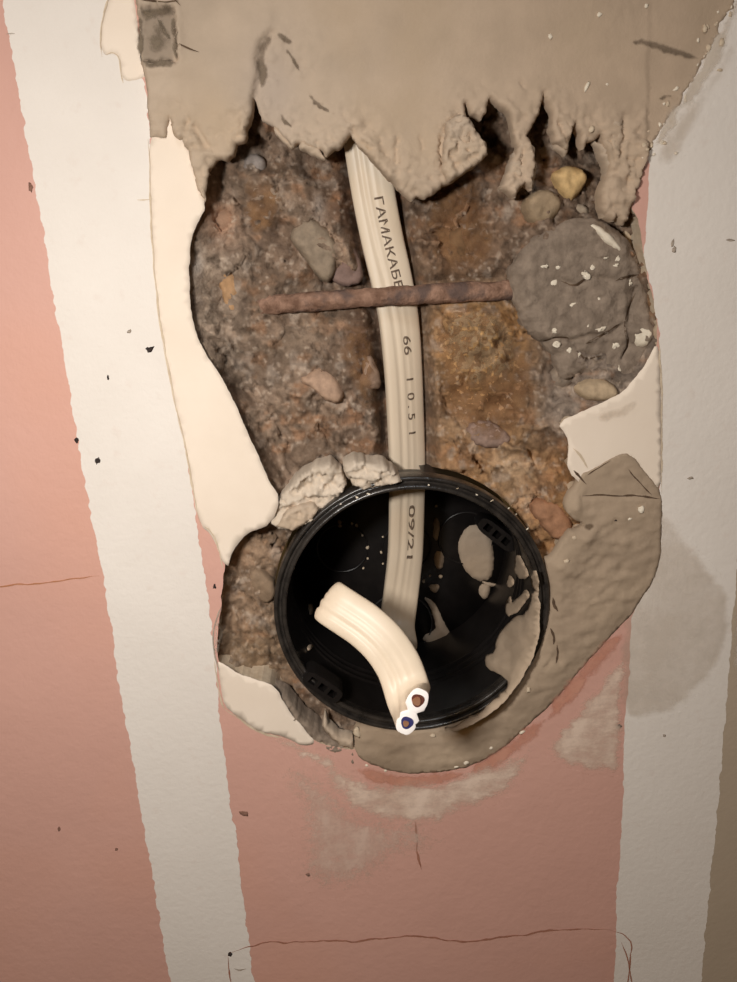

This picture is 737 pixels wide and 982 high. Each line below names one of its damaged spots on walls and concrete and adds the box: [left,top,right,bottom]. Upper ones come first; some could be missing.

peeling [591,224,621,251]
spalling [257,280,513,315]
peeling [141,120,279,568]
peeling [560,328,663,488]
crack [0,576,92,587]
peeling [214,661,314,745]
flaking render [322,709,354,749]
crack [228,929,632,982]